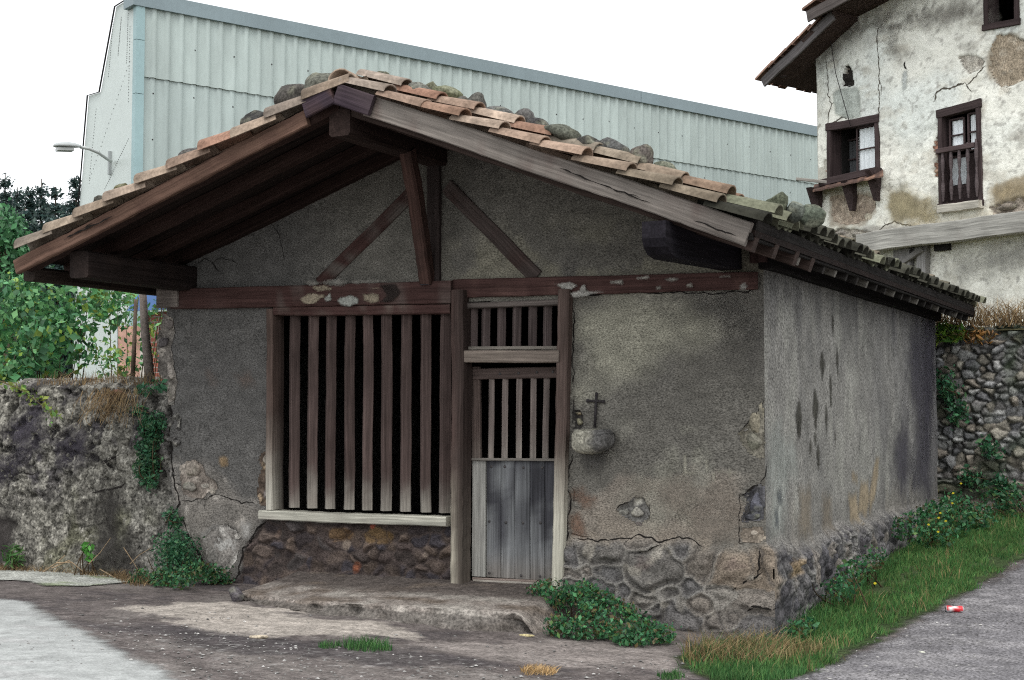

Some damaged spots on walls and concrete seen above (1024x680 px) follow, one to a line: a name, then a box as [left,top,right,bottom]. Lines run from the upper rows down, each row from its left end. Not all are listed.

crack [826,62,848,122]
crack [933,65,986,99]
spalling [958,34,1024,92]
spalling [830,194,876,241]
spalling [989,197,1024,215]
peeling [301,279,400,306]
peeling [558,282,597,297]
water stain [796,353,838,468]
crack [168,405,266,582]
crack [566,453,702,553]
spalling [741,484,766,543]
spalling [203,523,243,574]